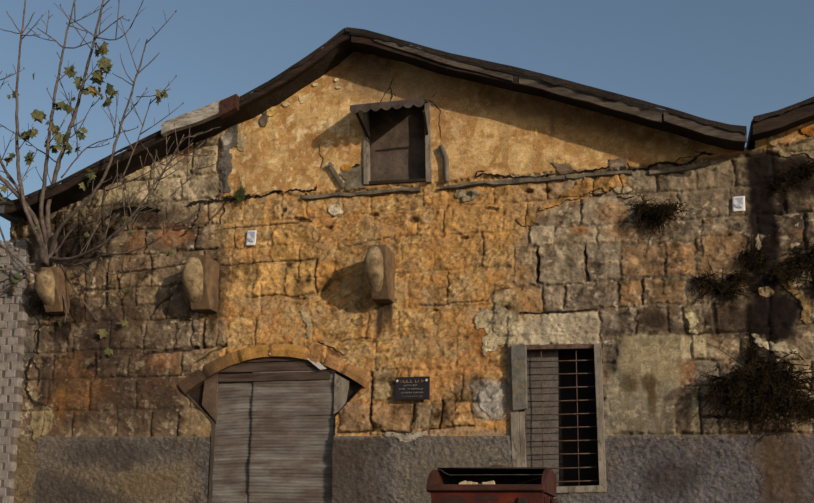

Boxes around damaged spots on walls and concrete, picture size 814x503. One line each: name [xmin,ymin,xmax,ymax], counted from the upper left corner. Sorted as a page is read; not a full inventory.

spalling [217,123,246,196]
crack [475,150,714,179]
peeling [517,157,632,227]
crack [573,188,634,200]
water stain [746,153,801,371]
crack [24,323,50,407]
spalling [684,312,698,334]
spalling [758,286,774,297]
spalling [751,334,790,354]
spalling [781,281,813,325]